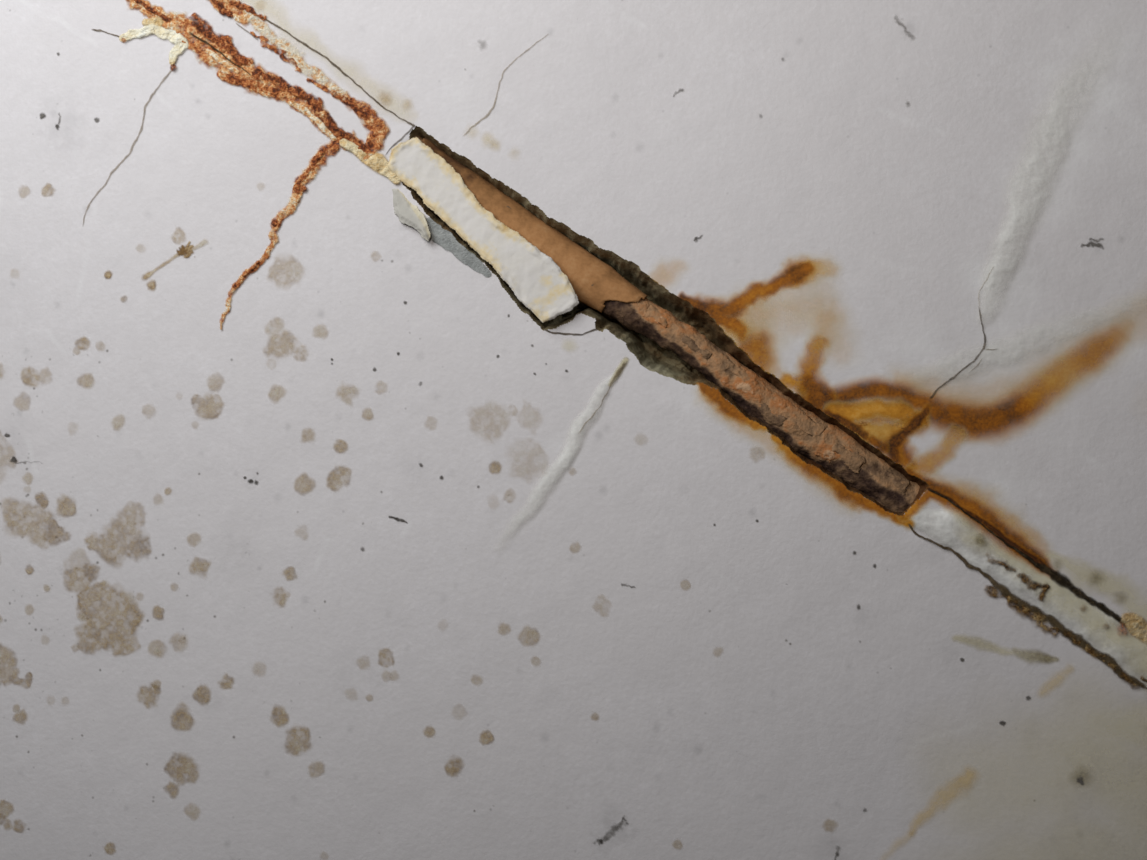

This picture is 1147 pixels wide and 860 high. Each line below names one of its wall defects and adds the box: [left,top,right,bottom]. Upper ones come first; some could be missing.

crack [83,71,171,224]
crack [126,0,414,330]
corrosion [143,241,206,289]
spalling [387,126,929,516]
corrosion [679,260,826,382]
crack [931,309,995,398]
water stain [5,494,75,542]
water stain [70,566,162,654]
corrosion [697,334,1118,576]
crack [909,490,1147,689]